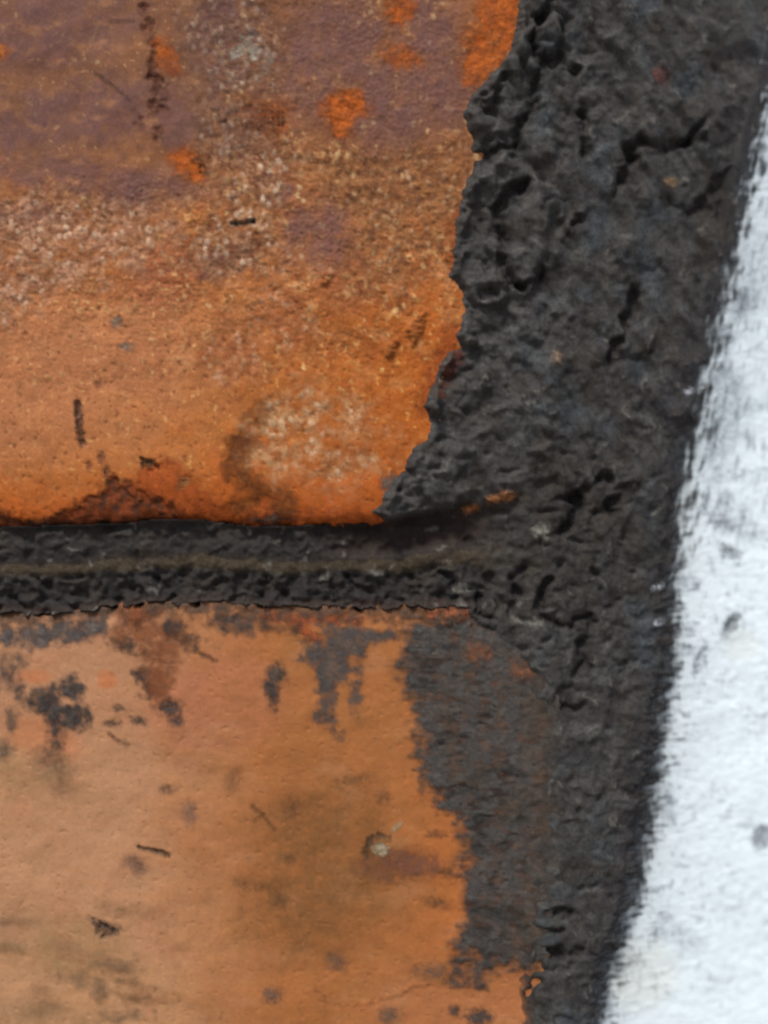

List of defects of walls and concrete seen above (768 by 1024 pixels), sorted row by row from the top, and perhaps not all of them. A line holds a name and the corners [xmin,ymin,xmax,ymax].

spalling [137,845,170,857]
peeling [363,833,389,858]